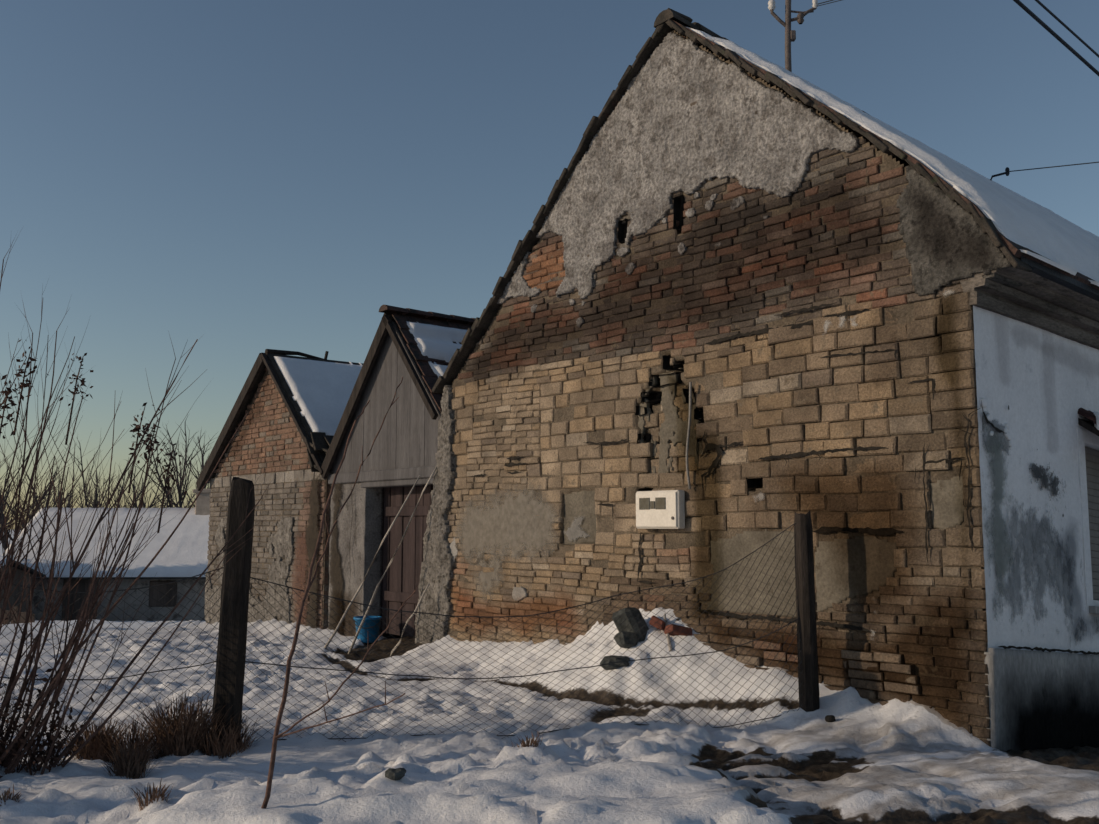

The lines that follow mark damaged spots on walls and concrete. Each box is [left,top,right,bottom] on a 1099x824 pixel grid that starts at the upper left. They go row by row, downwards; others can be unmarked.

flaking render [497,32,860,328]
spalling [635,355,704,420]
leakage [995,463,1097,641]